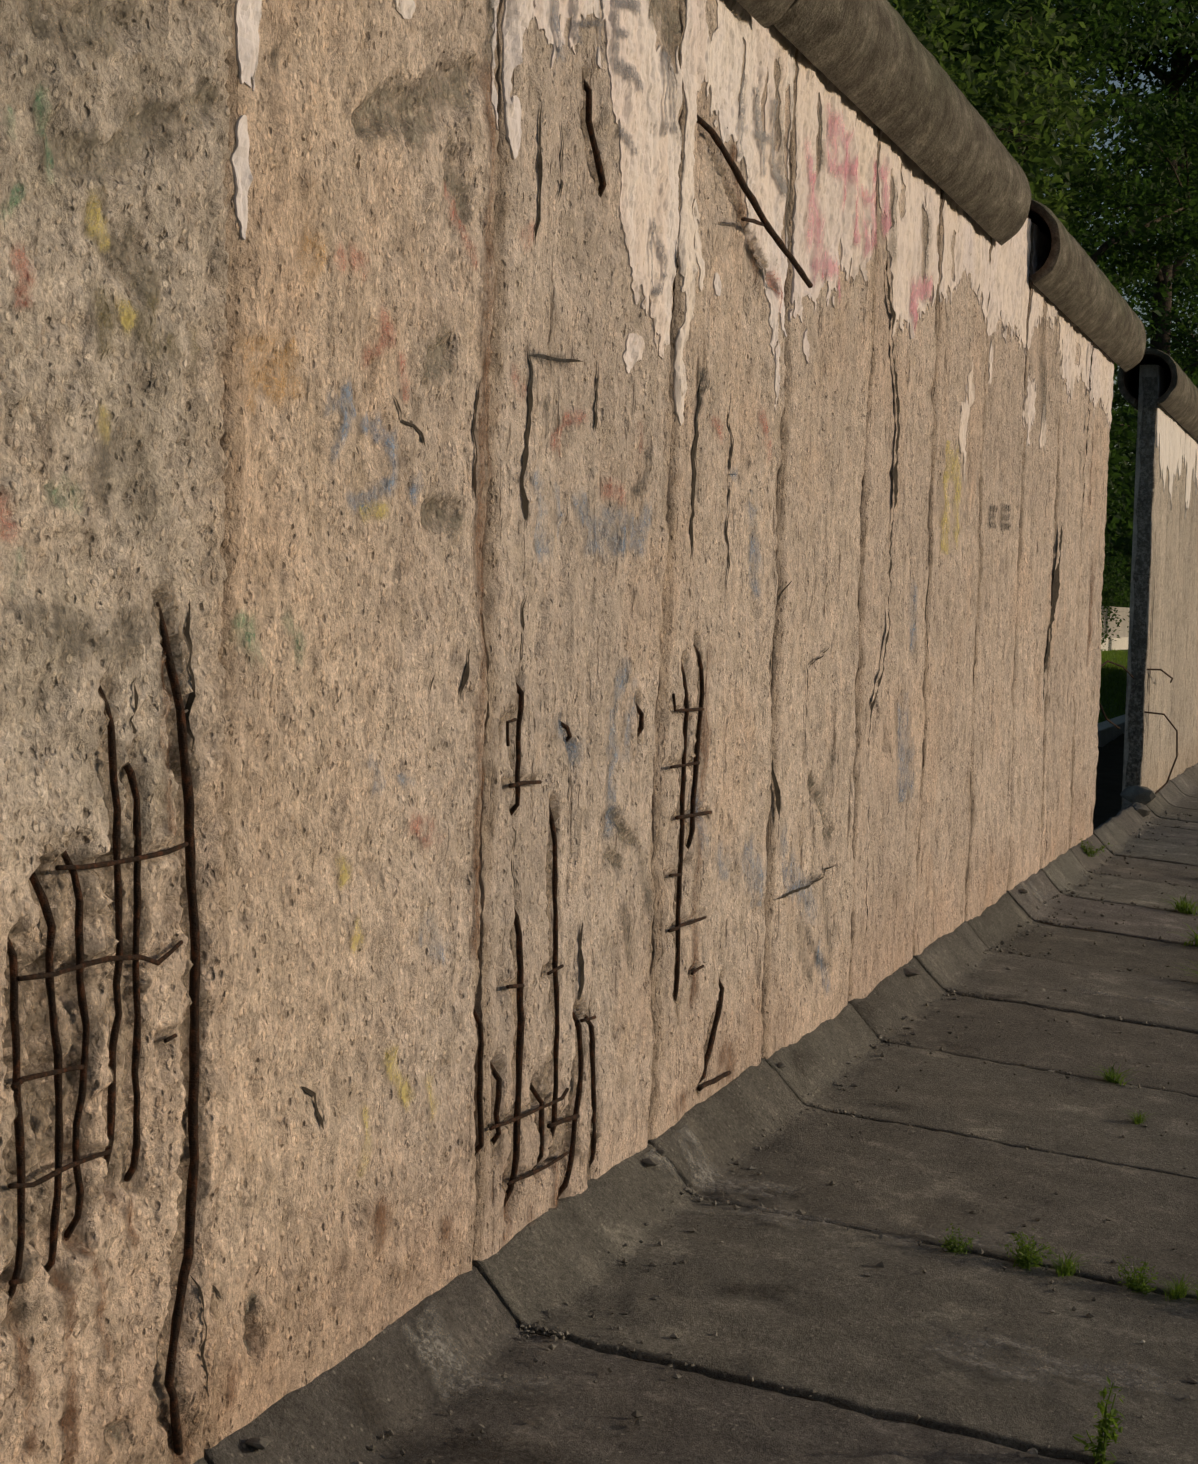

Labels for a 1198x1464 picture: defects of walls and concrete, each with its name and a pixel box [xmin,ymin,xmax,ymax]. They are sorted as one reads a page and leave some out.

peeling [230,115,253,240]
peeling [234,0,262,91]
peeling [394,0,416,19]
corrosion [476,195,493,600]
peeling [489,0,1114,481]
crack [868,245,929,765]
crack [1043,343,1094,700]
spalling [1125,365,1198,787]
spalling [0,585,211,1457]
corrosion [61,1375,79,1464]